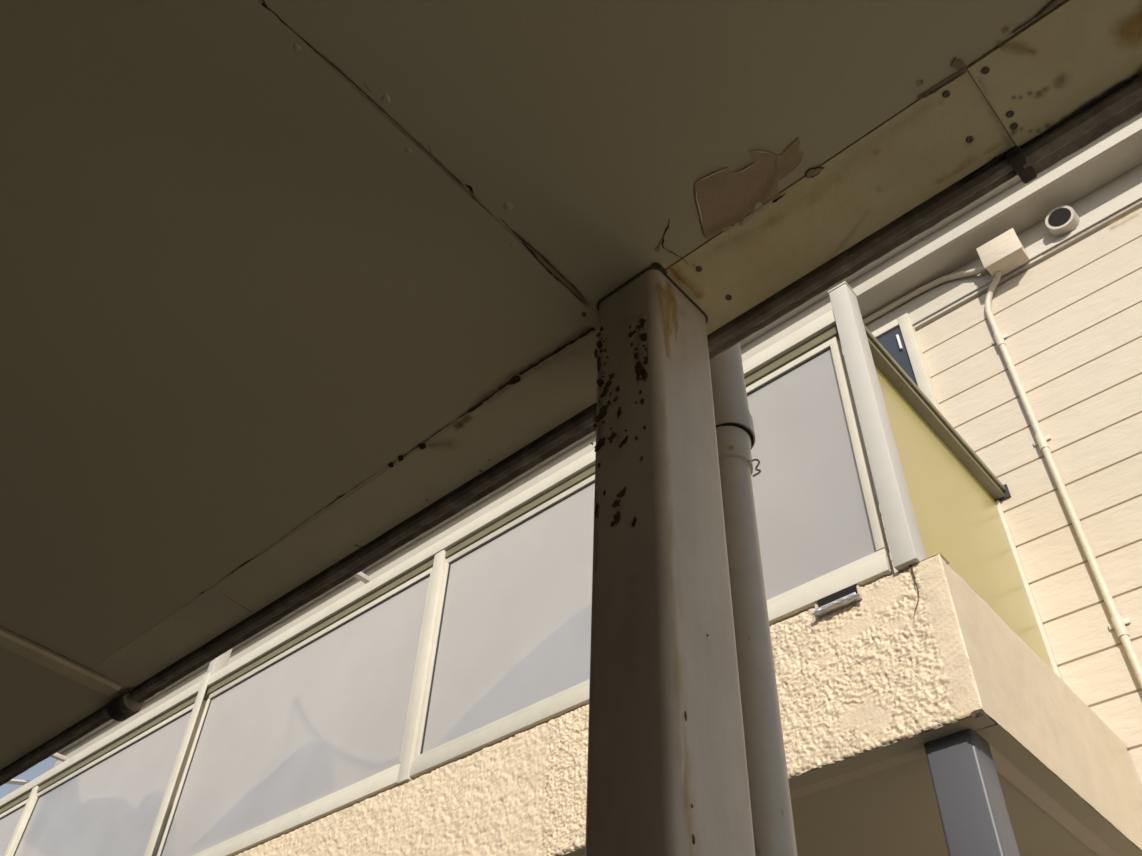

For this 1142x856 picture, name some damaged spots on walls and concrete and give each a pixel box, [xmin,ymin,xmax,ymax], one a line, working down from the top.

peeling [694,137,825,240]